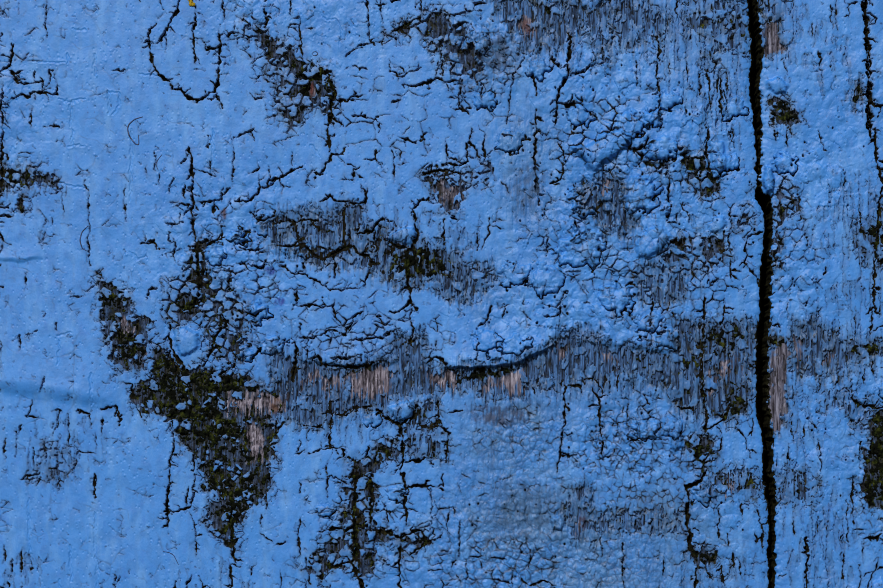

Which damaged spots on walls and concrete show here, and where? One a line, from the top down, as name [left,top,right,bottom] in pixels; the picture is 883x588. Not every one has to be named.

peeling [242,19,338,130]
peeling [384,9,488,86]
peeling [494,0,670,64]
crack [76,173,106,298]
crack [126,0,494,383]
peeling [268,204,496,305]
crack [377,0,883,588]
crack [3,383,146,498]
crack [150,393,565,588]
peeling [98,233,764,583]
peeling [767,318,883,510]
crack [1,545,34,588]